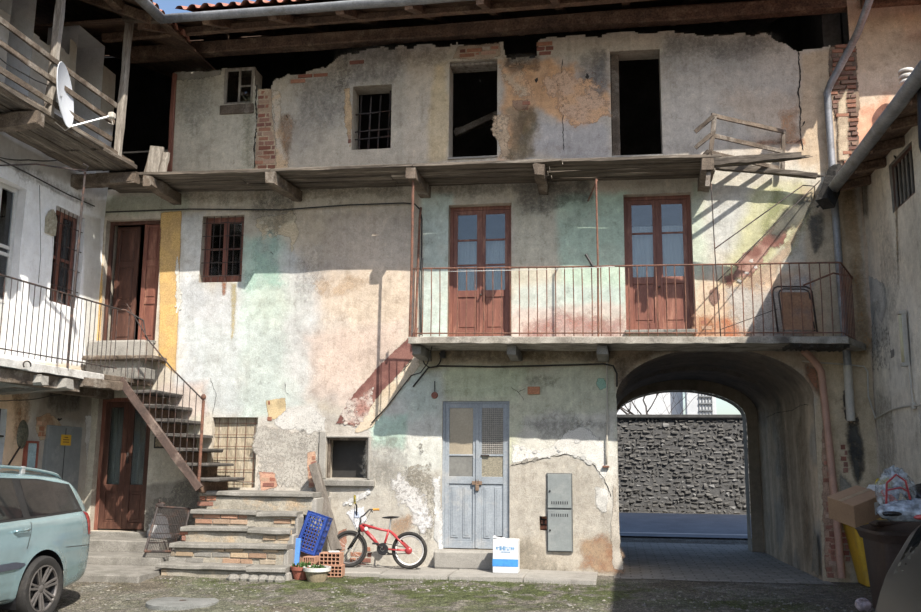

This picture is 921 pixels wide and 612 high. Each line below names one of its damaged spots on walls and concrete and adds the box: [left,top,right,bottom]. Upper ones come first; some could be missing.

flaking render [453,42,500,60]
flaking render [254,89,289,169]
peeling [491,100,530,160]
peeling [542,69,611,128]
crack [796,51,805,151]
flaking render [829,44,859,164]
peeling [336,328,420,433]
flaking render [252,398,326,490]
leakage [847,414,864,483]
peeling [391,473,443,549]
peeling [512,426,624,570]
flaking render [821,429,850,578]